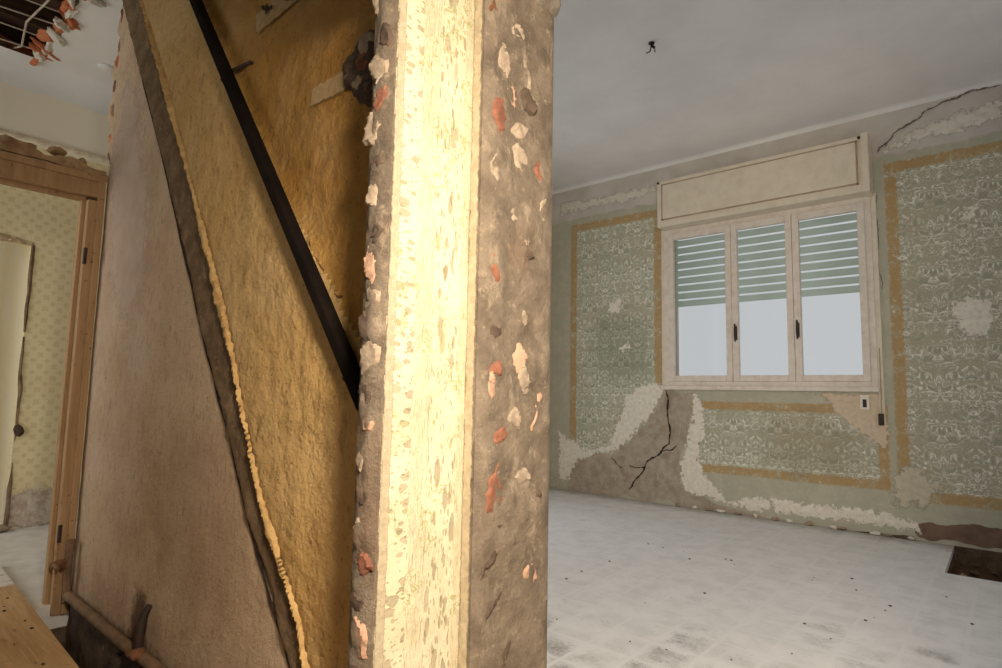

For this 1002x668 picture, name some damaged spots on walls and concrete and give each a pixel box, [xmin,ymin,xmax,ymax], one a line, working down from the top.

crack [877,85,999,152]
peeling [883,97,1002,155]
flaking render [139,0,310,668]
flaking render [342,0,400,668]
flaking render [468,0,554,668]
crack [612,391,676,490]
flaking render [566,390,793,523]
spalling [829,525,916,540]
spalling [947,546,1002,582]